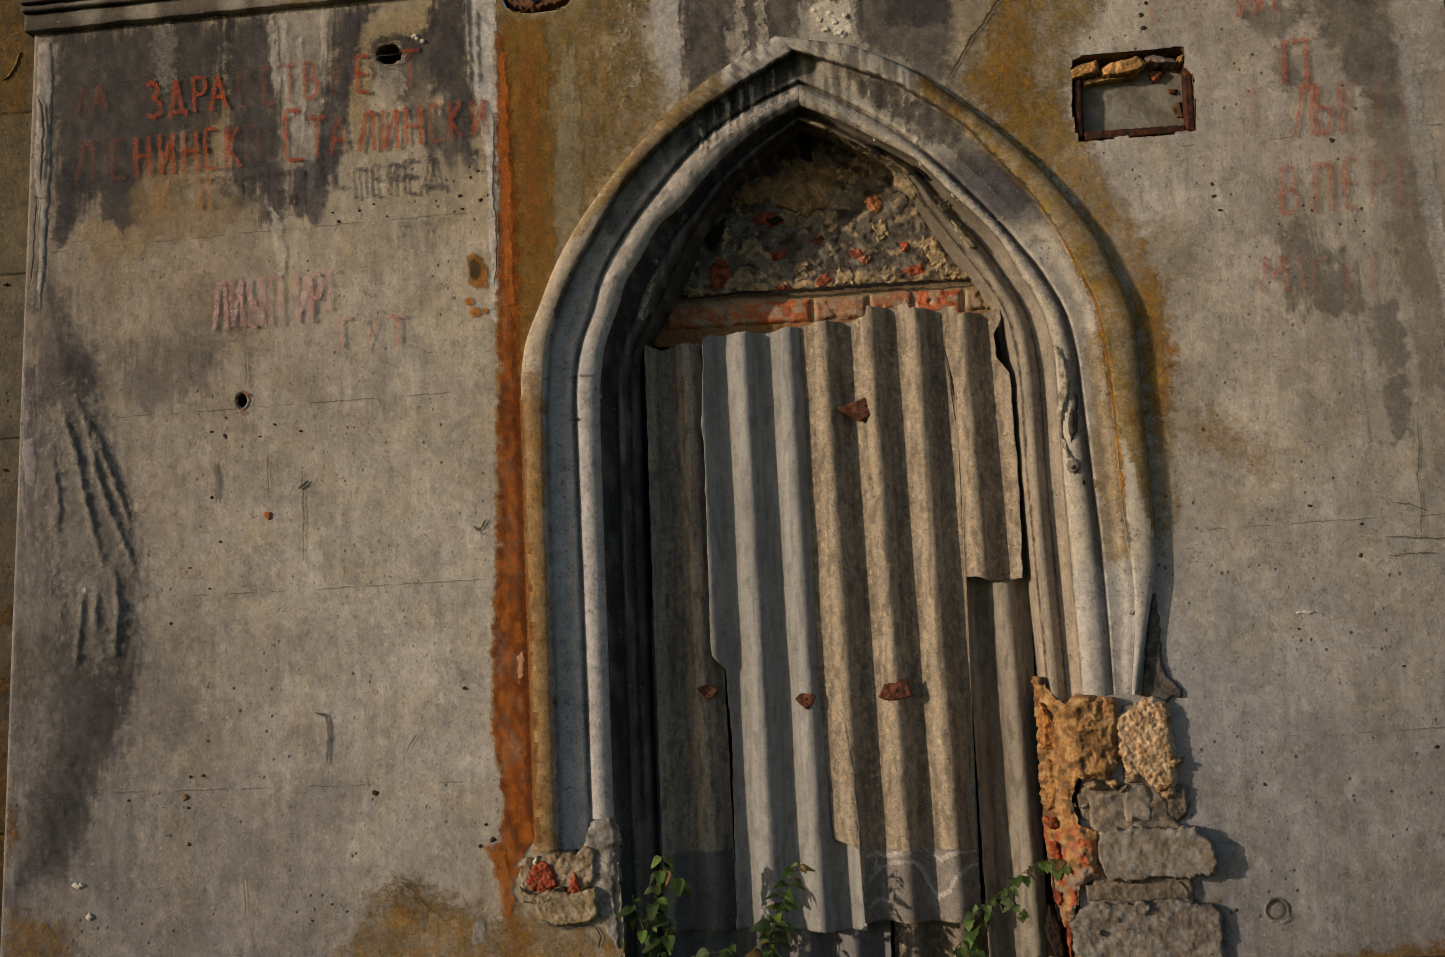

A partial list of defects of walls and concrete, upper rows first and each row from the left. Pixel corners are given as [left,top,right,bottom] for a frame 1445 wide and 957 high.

damp [51,4,335,271]
spalling [683,117,978,298]
damp [848,72,962,146]
crack [946,0,1000,80]
damp [885,0,1193,413]
damp [1369,0,1445,318]
rust [464,31,561,919]
damp [1350,298,1412,476]
damp [335,876,624,957]
spalling [518,845,595,905]
spalling [1031,676,1184,957]